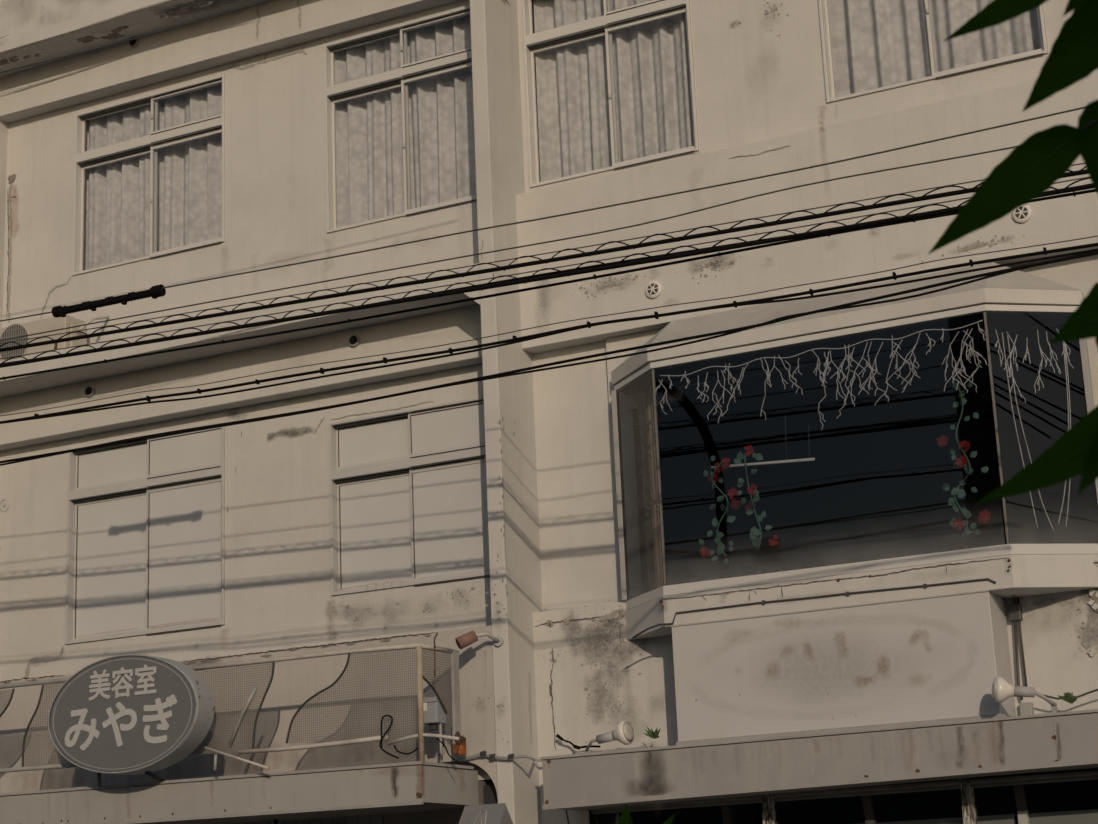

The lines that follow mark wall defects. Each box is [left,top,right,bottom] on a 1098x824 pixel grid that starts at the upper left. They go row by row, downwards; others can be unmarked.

crack [40,277,71,319]
crack [549,622,557,749]
damp [557,598,656,743]
spalling [1070,588,1098,657]